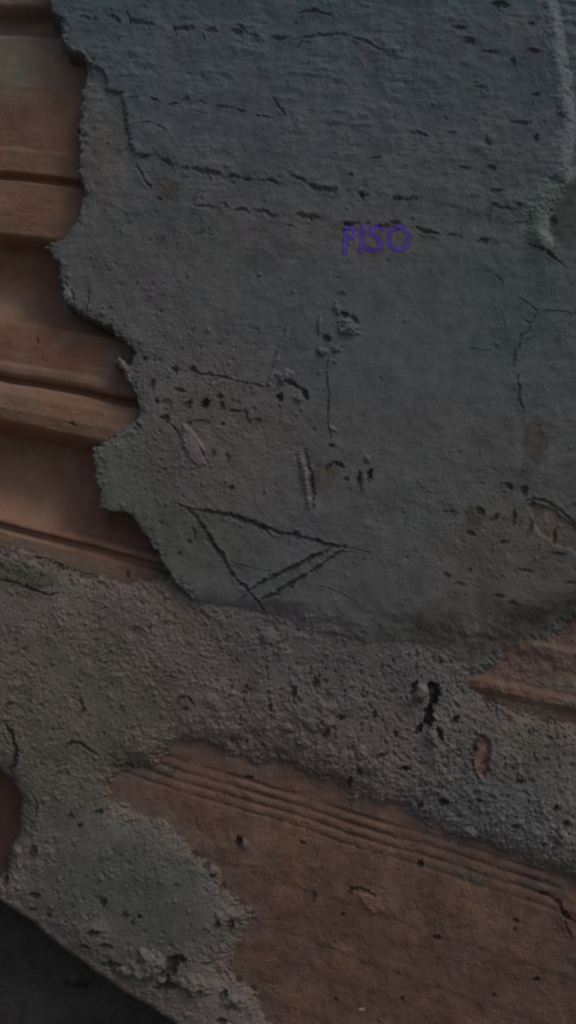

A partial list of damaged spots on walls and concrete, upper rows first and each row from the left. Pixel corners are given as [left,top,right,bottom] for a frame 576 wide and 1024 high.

crack [78,7,405,53]
crack [123,86,463,240]
spalling [45,0,148,389]
crack [486,202,526,224]
spalling [148,379,261,426]
spalling [468,733,493,781]
spalling [80,929,123,969]